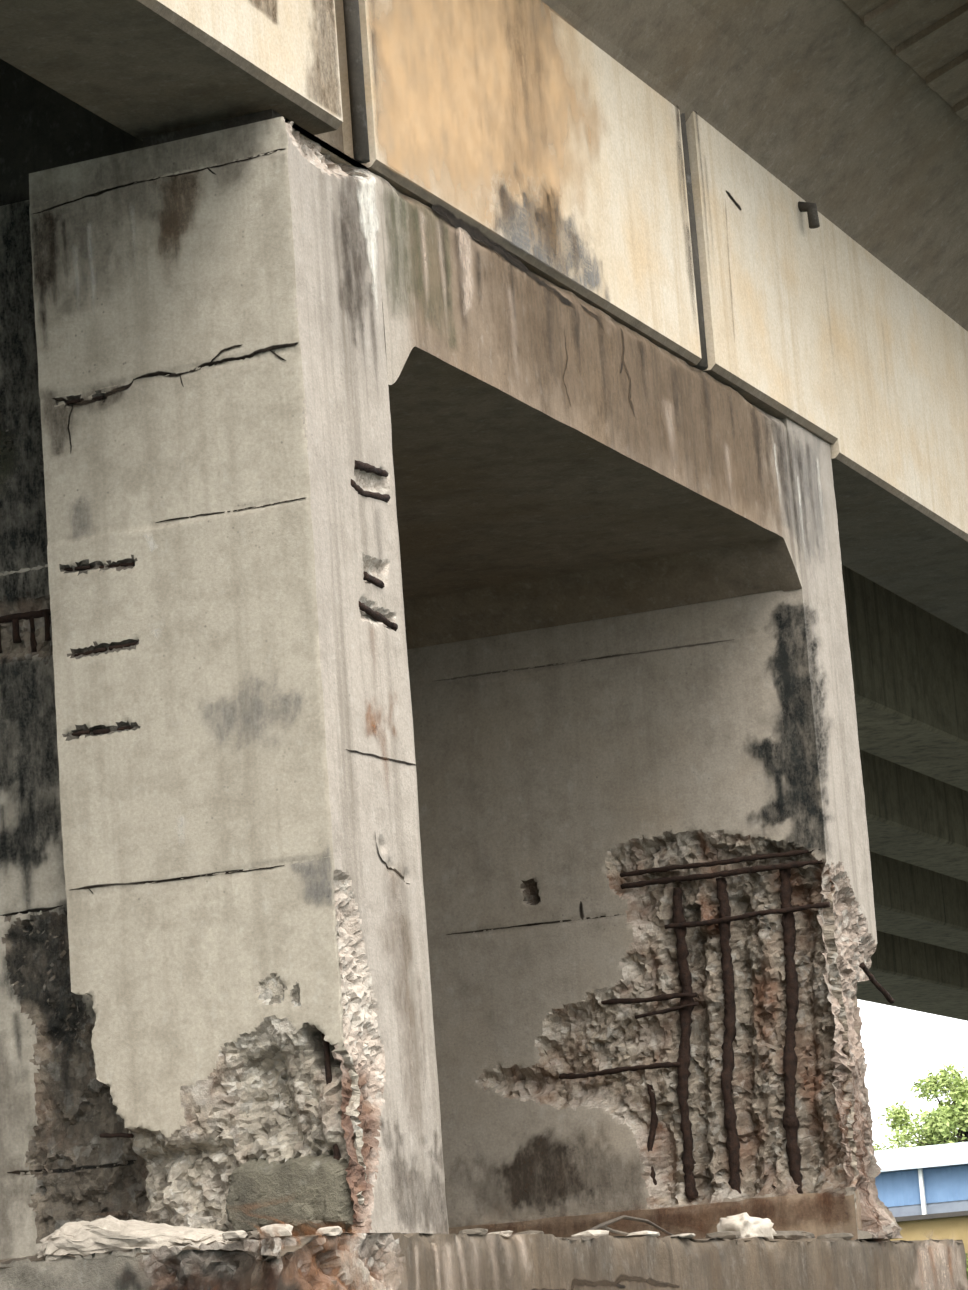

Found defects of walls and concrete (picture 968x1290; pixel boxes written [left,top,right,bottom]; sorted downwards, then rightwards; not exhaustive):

crack [33,148,285,214]
leakage [345,176,378,288]
leakage [372,0,608,307]
leakage [0,197,66,604]
crack [52,342,298,453]
leakage [0,615,63,901]
leakage [750,605,829,852]
leakage [5,903,87,1057]
spalling [1,869,405,1290]
spalling [475,829,902,1239]
crack [532,1275,680,1290]